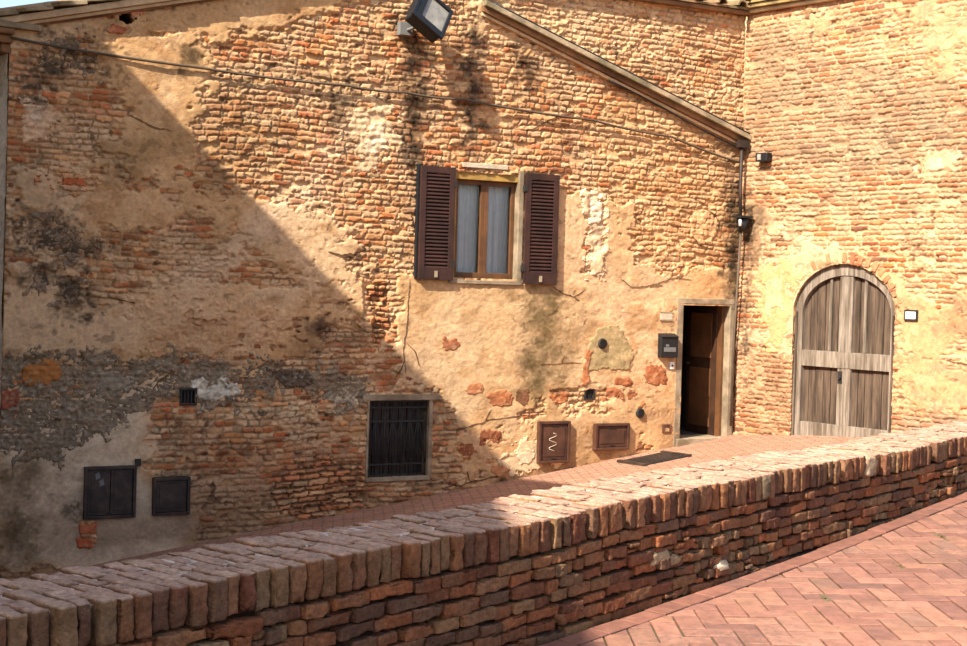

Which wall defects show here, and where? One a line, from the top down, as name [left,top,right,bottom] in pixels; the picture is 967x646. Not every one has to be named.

spalling [107,11,146,35]
flaking render [17,25,108,142]
crack [128,114,171,131]
flaking render [336,93,407,181]
damp [400,82,430,165]
damp [455,14,487,145]
crack [621,274,691,289]
crack [394,286,420,380]
flaking render [0,344,370,476]
spalling [603,376,645,409]
spalling [643,364,668,386]